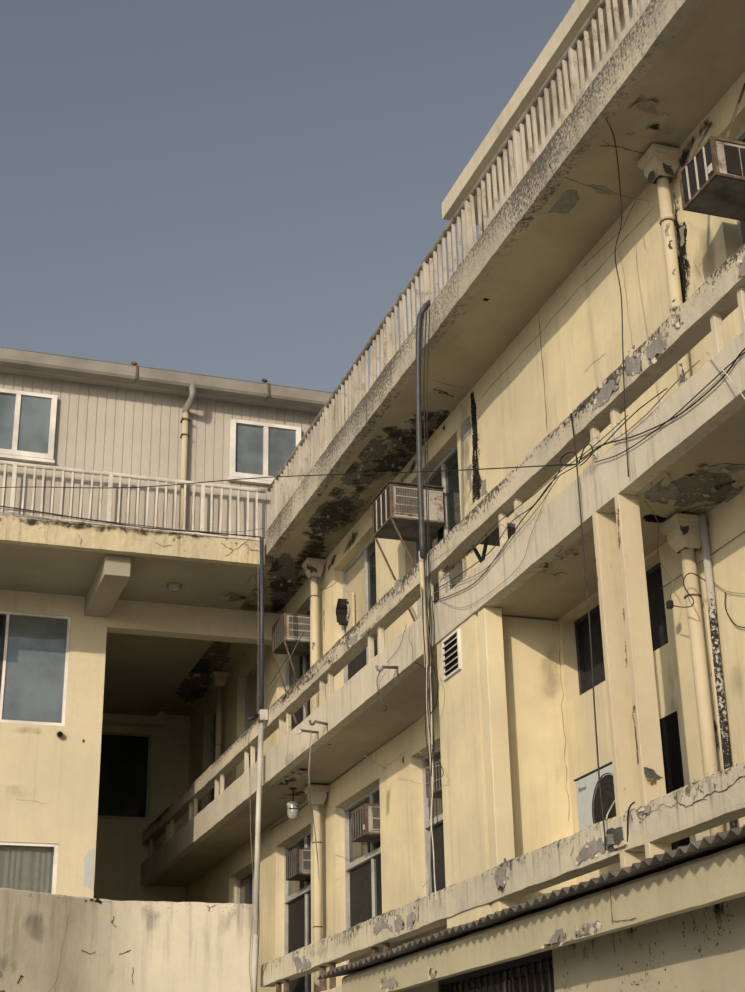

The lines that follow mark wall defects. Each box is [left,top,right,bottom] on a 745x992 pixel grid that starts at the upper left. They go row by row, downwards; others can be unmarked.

peeling [594,299,684,410]
leakage [333,415,445,516]
leakage [461,392,488,504]
peeling [642,463,745,523]
leakage [20,519,173,535]
leakage [288,528,358,593]
crack [646,776,745,816]
peeling [576,827,628,865]
peeling [493,858,509,893]
peeling [374,906,417,938]
peeling [540,920,602,949]